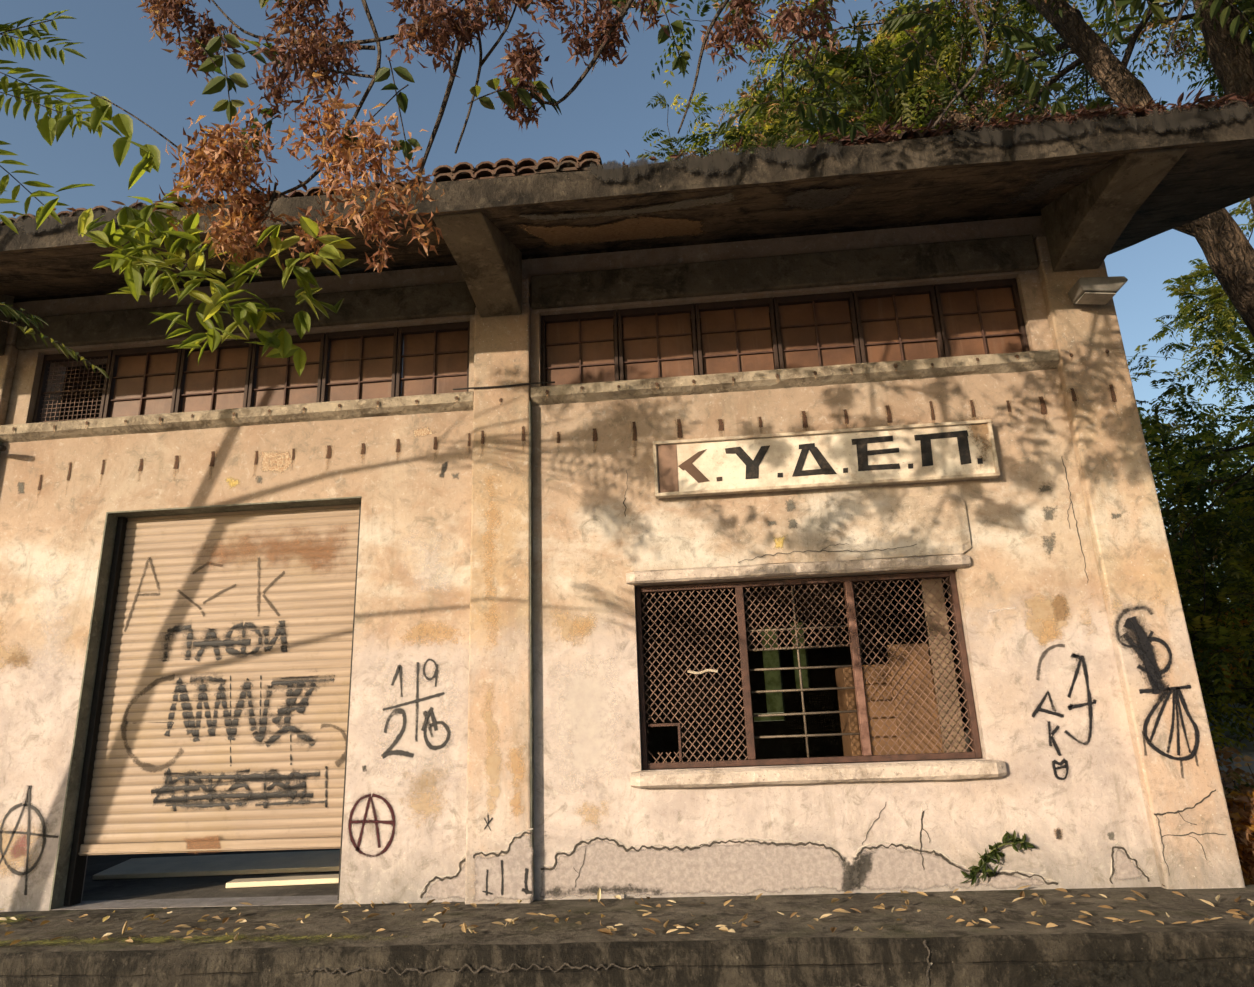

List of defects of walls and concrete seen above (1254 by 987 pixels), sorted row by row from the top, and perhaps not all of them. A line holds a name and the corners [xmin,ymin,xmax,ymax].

corrosion [212,538,334,568]
peeling [484,691,525,814]
spalling [420,828,1058,901]
crack [920,804,930,869]
crack [1154,789,1226,872]